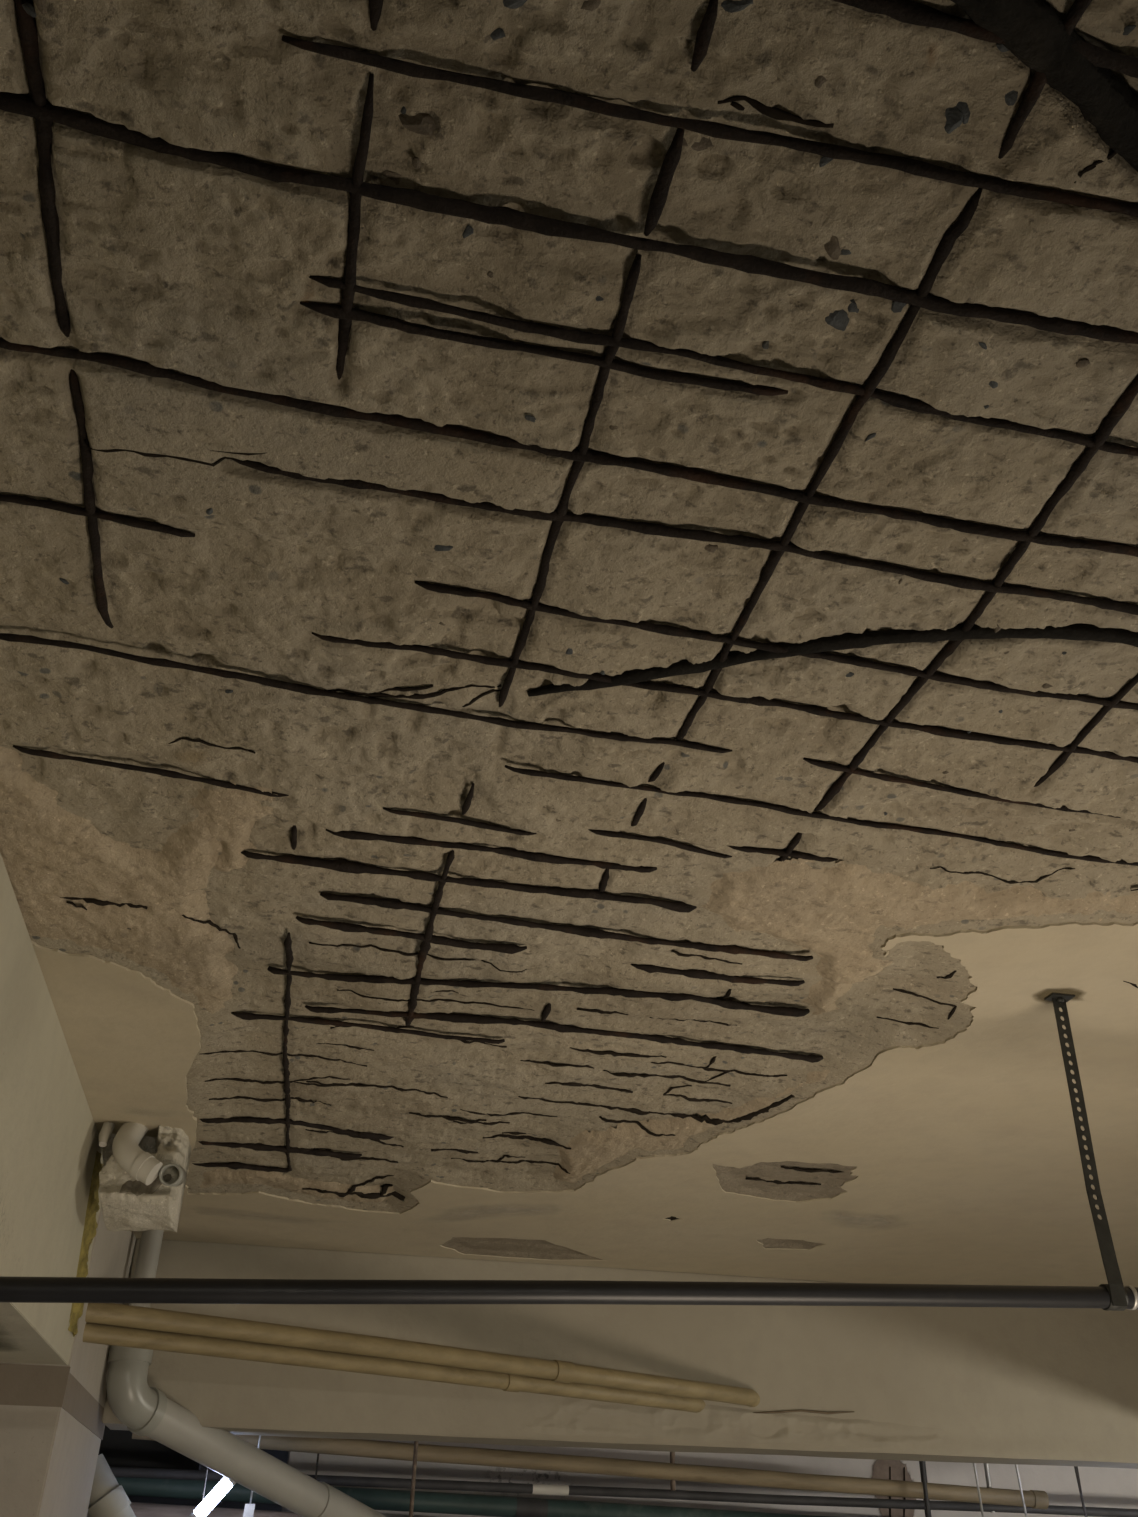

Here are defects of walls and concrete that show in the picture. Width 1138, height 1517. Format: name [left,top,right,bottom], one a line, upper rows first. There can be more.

spalling [0,0,1138,1212]
corrosion [1036,989,1082,1002]